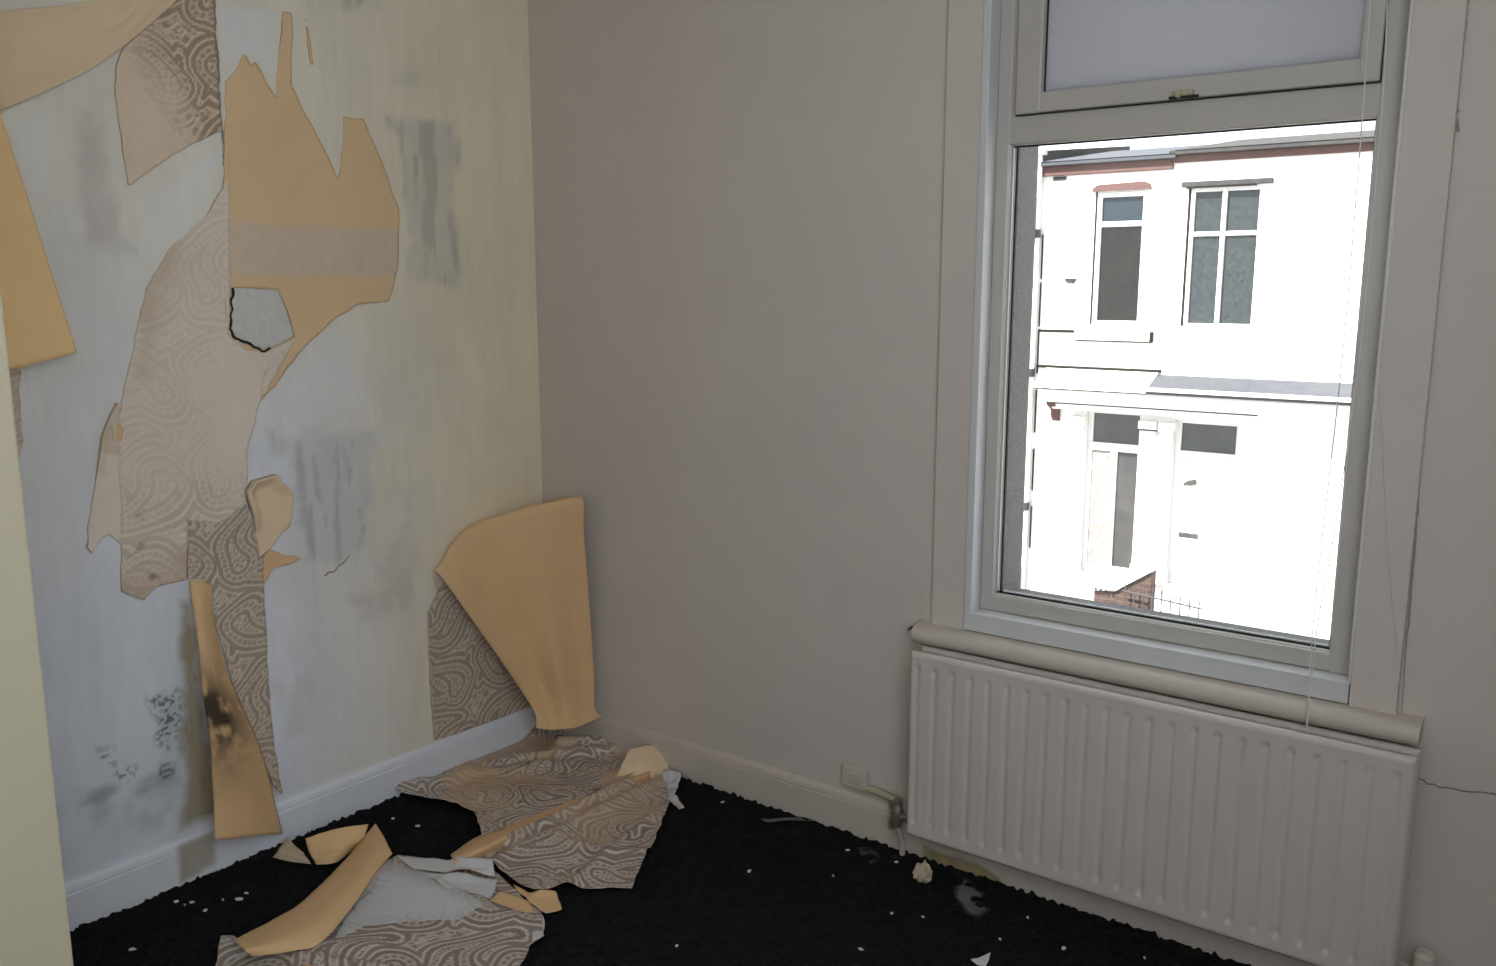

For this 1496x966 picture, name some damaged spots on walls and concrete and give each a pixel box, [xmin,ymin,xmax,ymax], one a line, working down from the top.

peeling [306,20,314,65]
flaking render [231,288,294,348]
peeling [86,403,124,553]
peeling [245,474,300,584]
water stain [184,626,214,818]
crack [1419,779,1496,795]